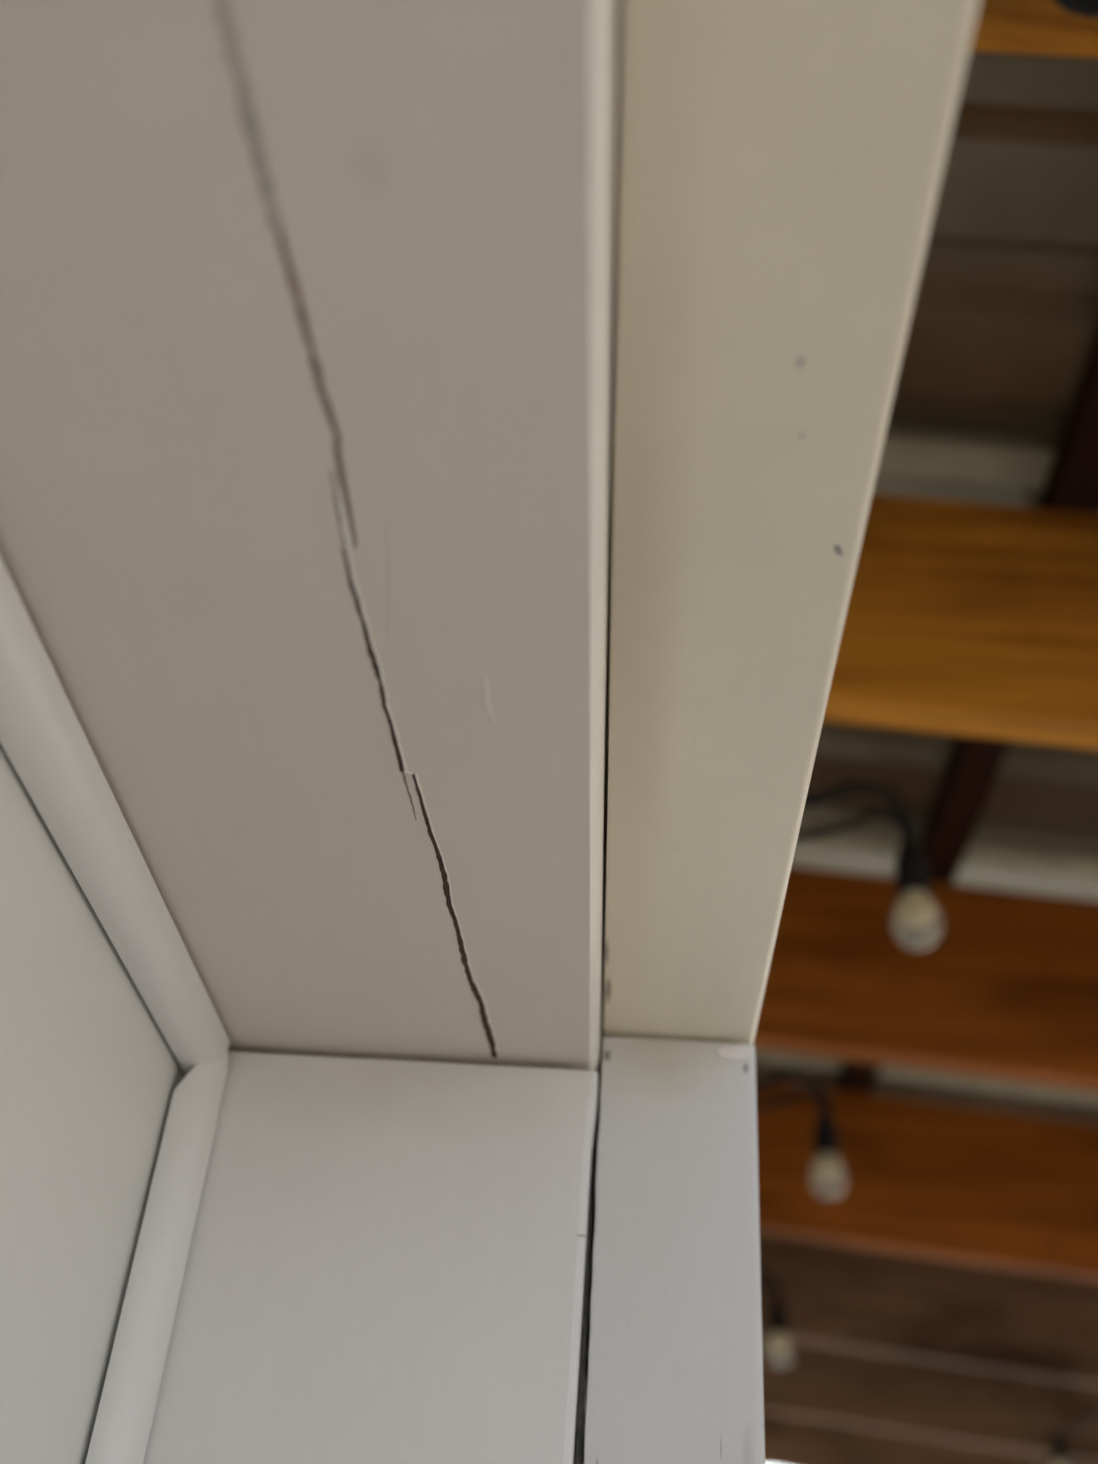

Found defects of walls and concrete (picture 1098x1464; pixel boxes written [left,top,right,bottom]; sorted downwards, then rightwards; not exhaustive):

crack [215,0,499,1058]